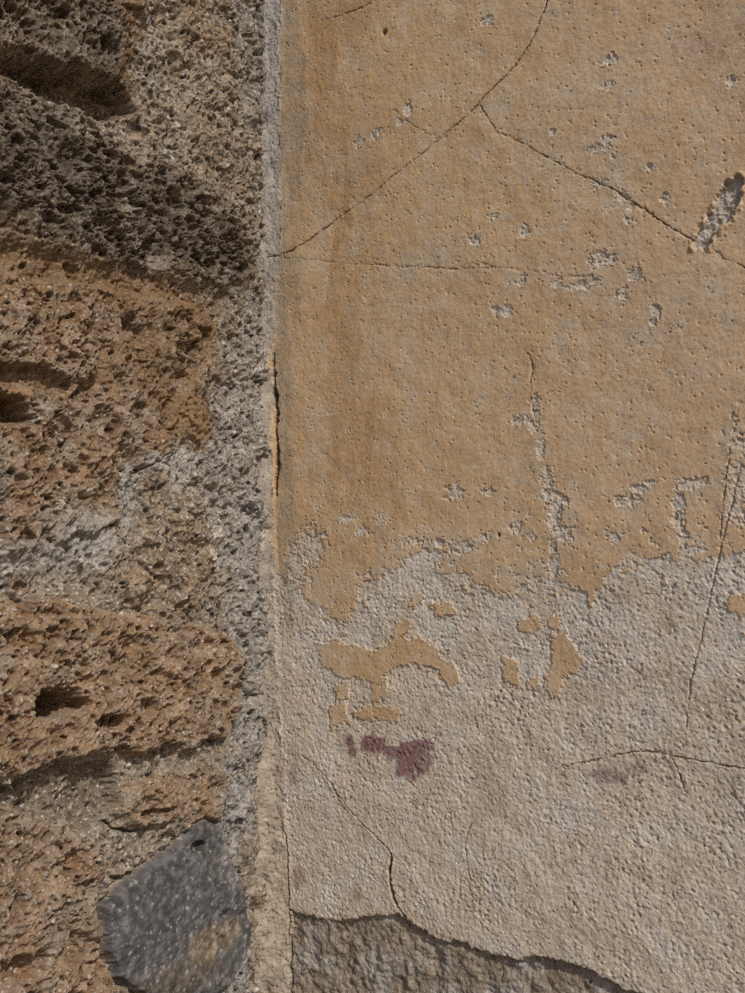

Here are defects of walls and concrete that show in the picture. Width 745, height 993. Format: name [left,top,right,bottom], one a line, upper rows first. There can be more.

crack [265,0,745,278]
crack [271,352,281,495]
flaking render [273,392,745,993]
crack [553,750,745,794]
crack [685,400,745,729]